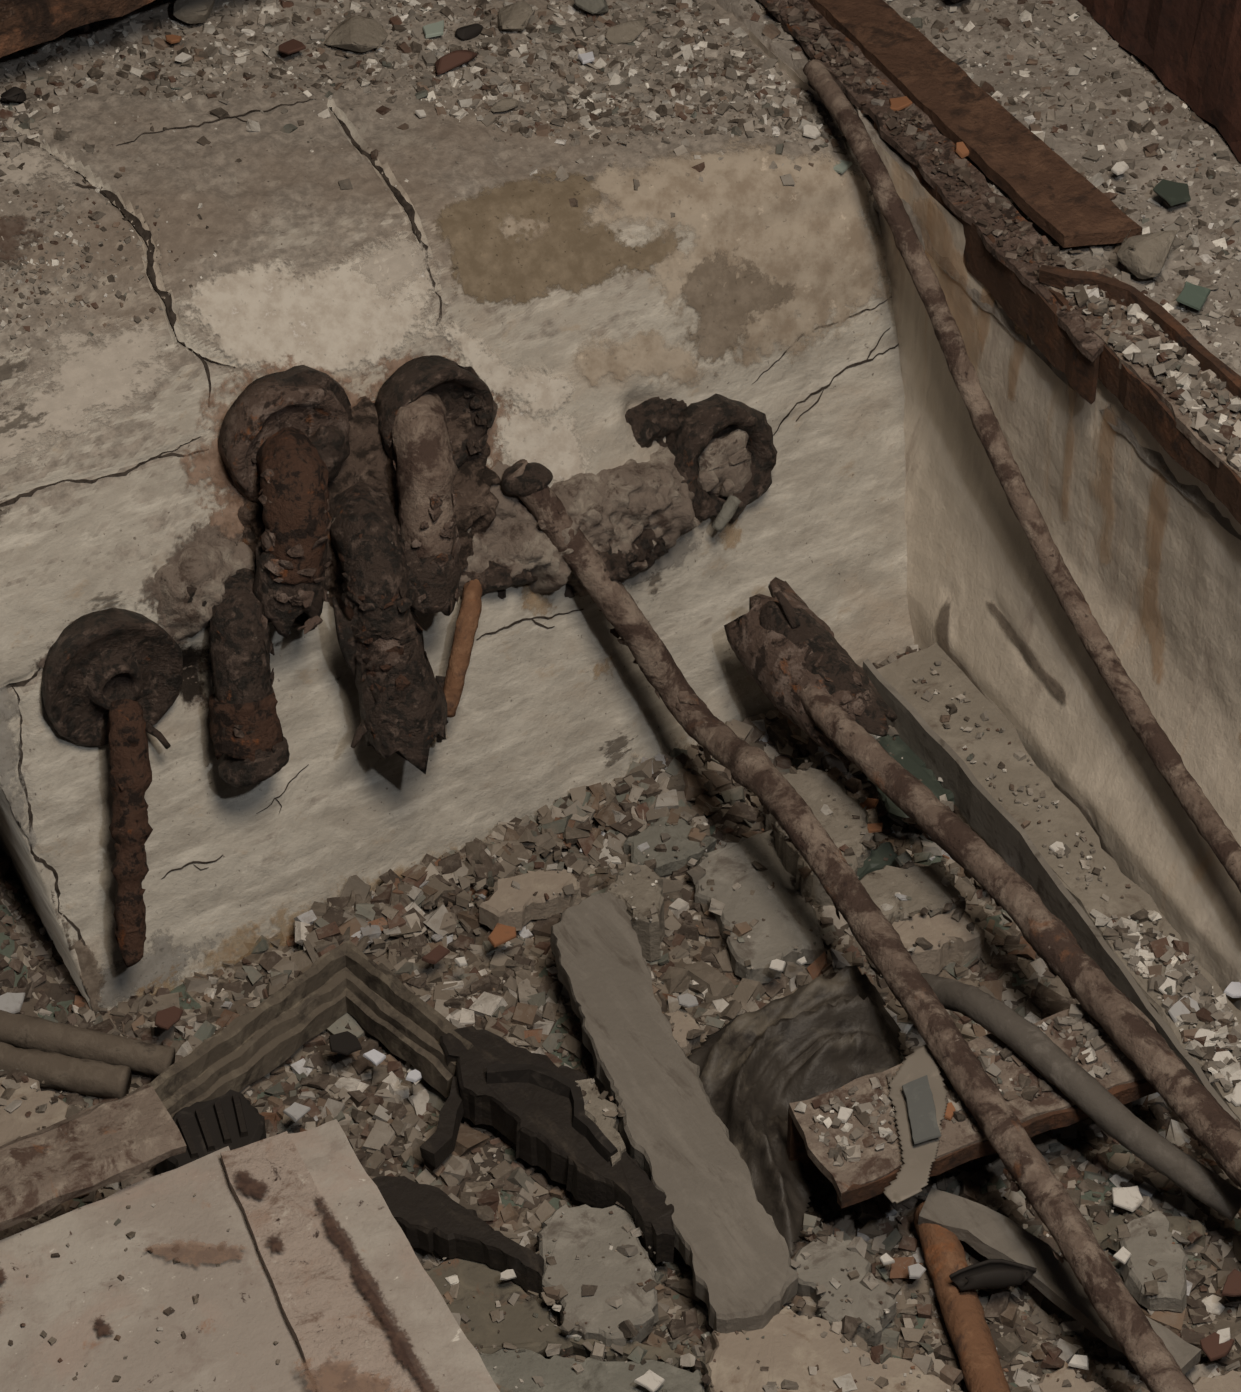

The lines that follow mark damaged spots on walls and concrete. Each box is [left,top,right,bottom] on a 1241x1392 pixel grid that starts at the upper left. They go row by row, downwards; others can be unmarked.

crack [116,99,442,326]
crack [0,149,236,511]
rust [181,355,295,541]
rust [316,353,413,409]
rust [487,390,513,469]
water stain [576,252,794,386]
crack [752,297,899,436]